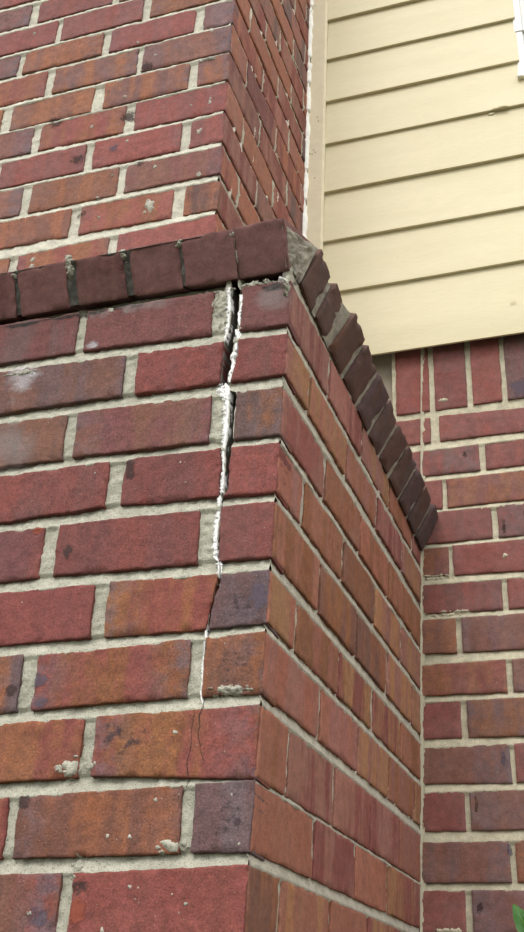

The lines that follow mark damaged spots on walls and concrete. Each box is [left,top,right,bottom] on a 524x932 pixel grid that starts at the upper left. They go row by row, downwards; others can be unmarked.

crack [186,285,243,787]